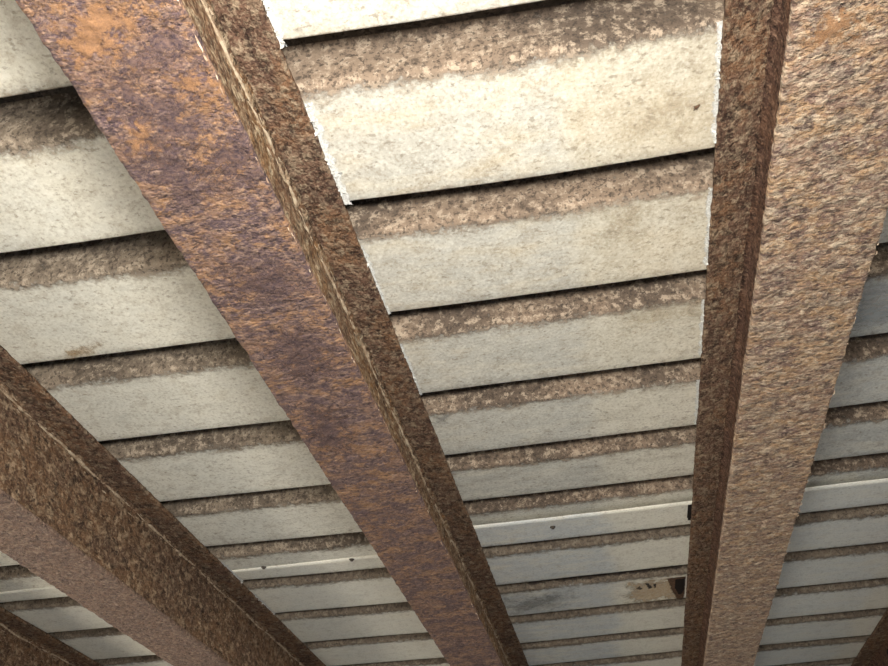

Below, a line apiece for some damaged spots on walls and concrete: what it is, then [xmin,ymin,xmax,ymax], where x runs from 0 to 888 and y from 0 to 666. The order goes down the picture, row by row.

corrosion [801,4,873,51]
corrosion [210,253,317,309]
corrosion [257,322,355,390]